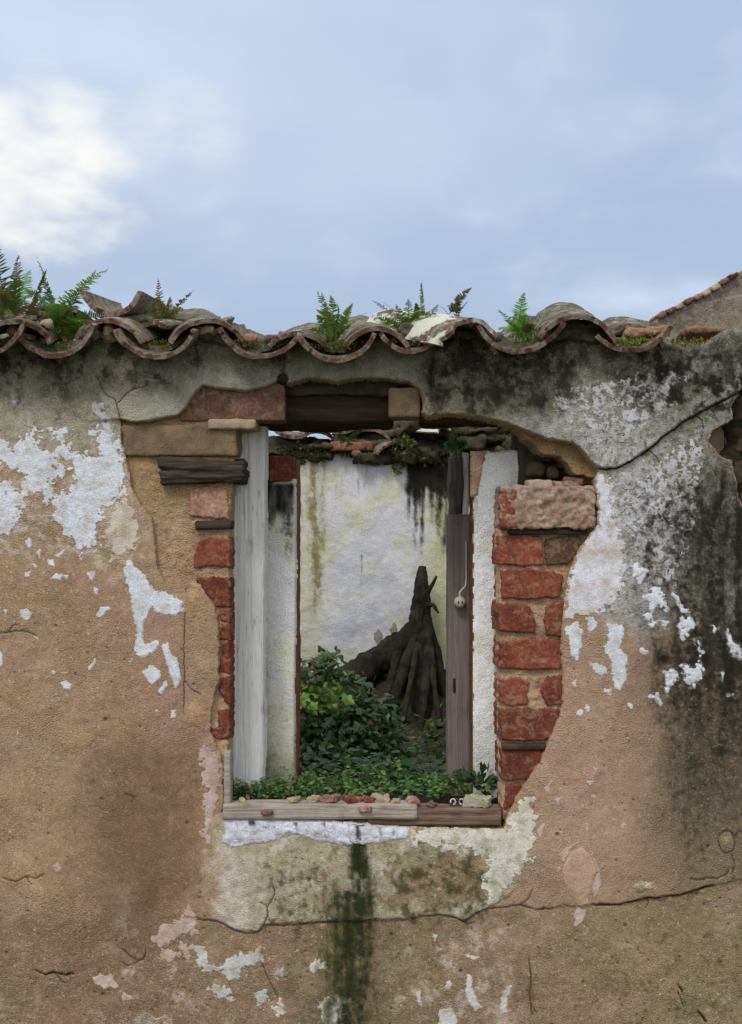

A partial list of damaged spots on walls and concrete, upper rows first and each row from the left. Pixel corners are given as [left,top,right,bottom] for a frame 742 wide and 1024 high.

leakage [102,341,136,377]
crack [599,391,741,470]
leakage [405,458,448,545]
peeling [0,401,185,694]
peeling [513,430,742,706]
leakage [640,467,742,753]
leakage [352,824,363,866]
peeling [198,745,560,905]
crack [200,882,338,934]
crack [434,891,553,924]
peeling [150,905,265,1002]
peeling [317,992,352,1024]